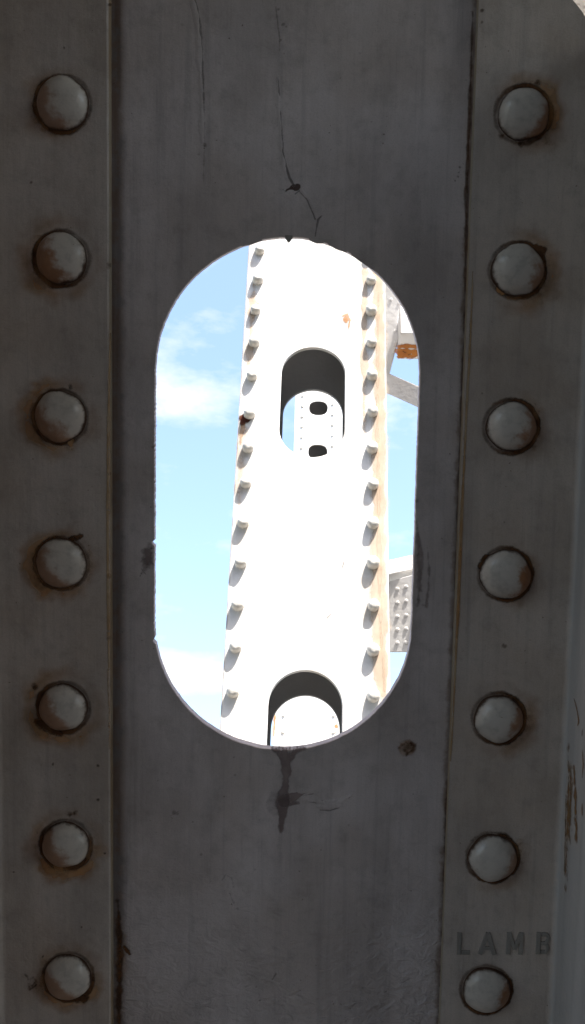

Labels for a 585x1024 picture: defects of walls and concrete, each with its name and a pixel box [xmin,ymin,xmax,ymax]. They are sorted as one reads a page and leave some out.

crack [274,75,321,236]
damp [271,746,353,832]